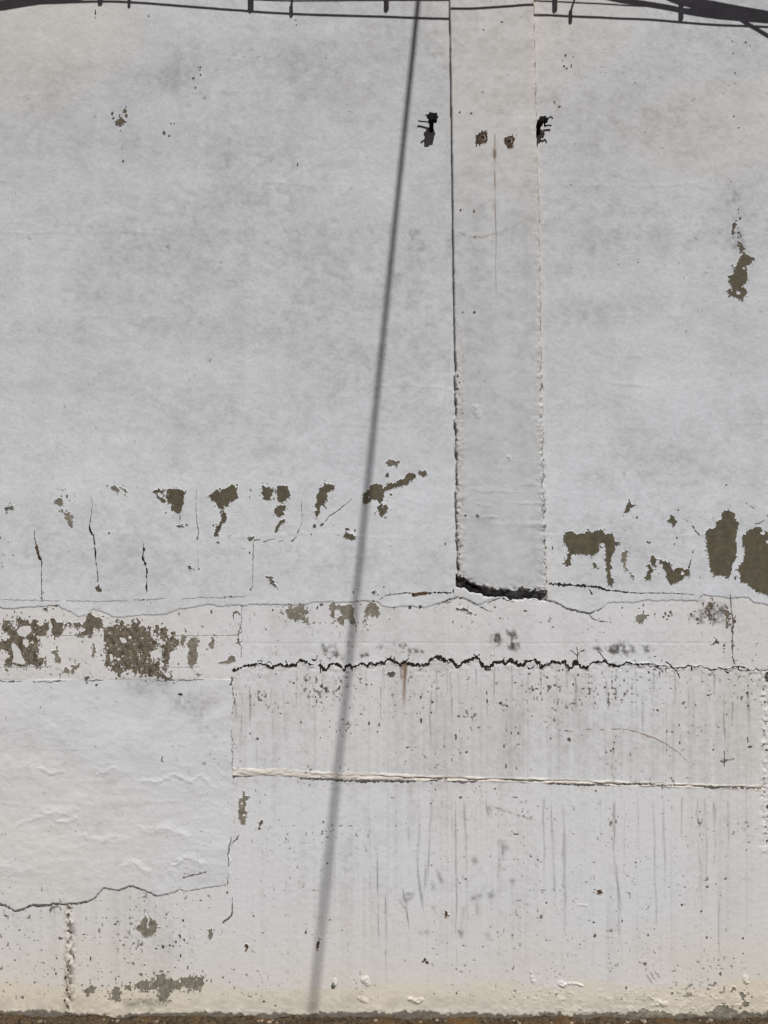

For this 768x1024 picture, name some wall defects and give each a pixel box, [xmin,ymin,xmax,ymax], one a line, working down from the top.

peeling [726,209,756,302]
peeling [152,487,188,528]
peeling [206,482,293,544]
peeling [362,459,428,518]
peeling [506,509,768,597]
peeling [0,598,217,686]
crack [0,498,768,777]
crack [300,776,477,784]
crack [502,778,672,786]
crack [703,783,761,791]
crack [0,836,238,923]
peeling [55,907,235,1007]